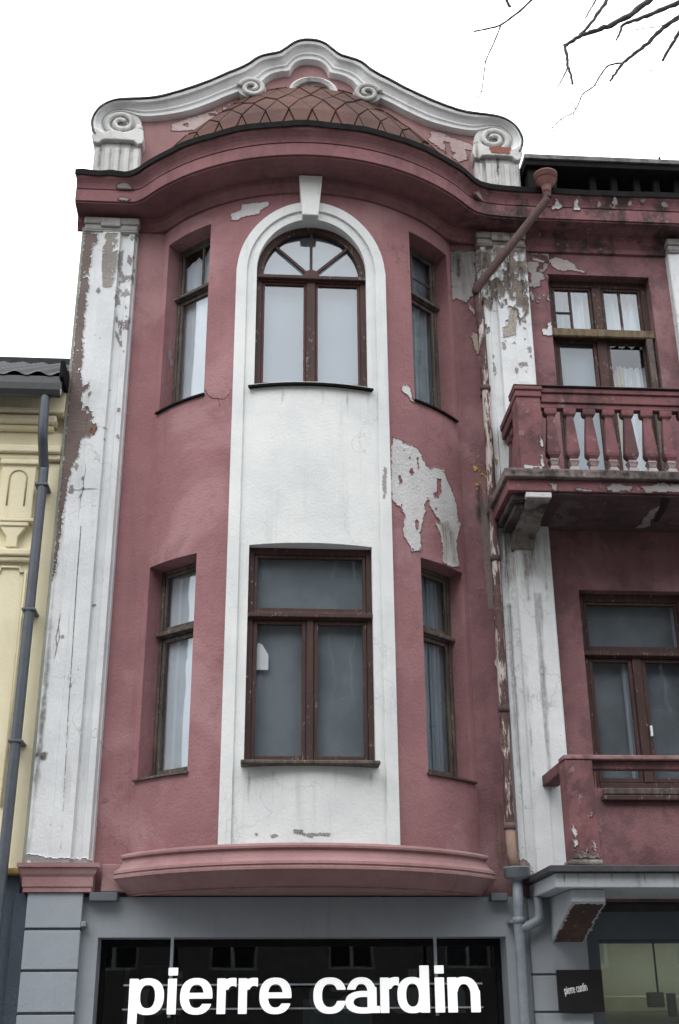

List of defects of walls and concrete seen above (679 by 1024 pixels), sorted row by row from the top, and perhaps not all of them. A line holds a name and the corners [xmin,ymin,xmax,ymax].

peeling [170,104,230,132]
peeling [427,130,473,163]
peeling [229,201,270,221]
peeling [550,198,581,212]
peeling [449,246,588,376]
peeling [52,232,137,581]
peeling [382,436,462,568]
peeling [574,482,679,494]
spalling [635,506,660,528]
spalling [570,824,602,859]